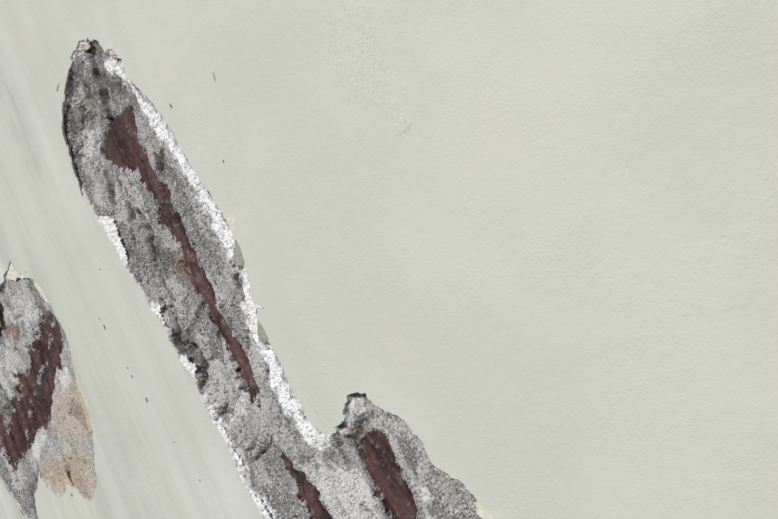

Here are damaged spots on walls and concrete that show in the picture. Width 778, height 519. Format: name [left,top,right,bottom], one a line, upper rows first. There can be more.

spalling [0,261,97,519]
spalling [56,38,494,519]